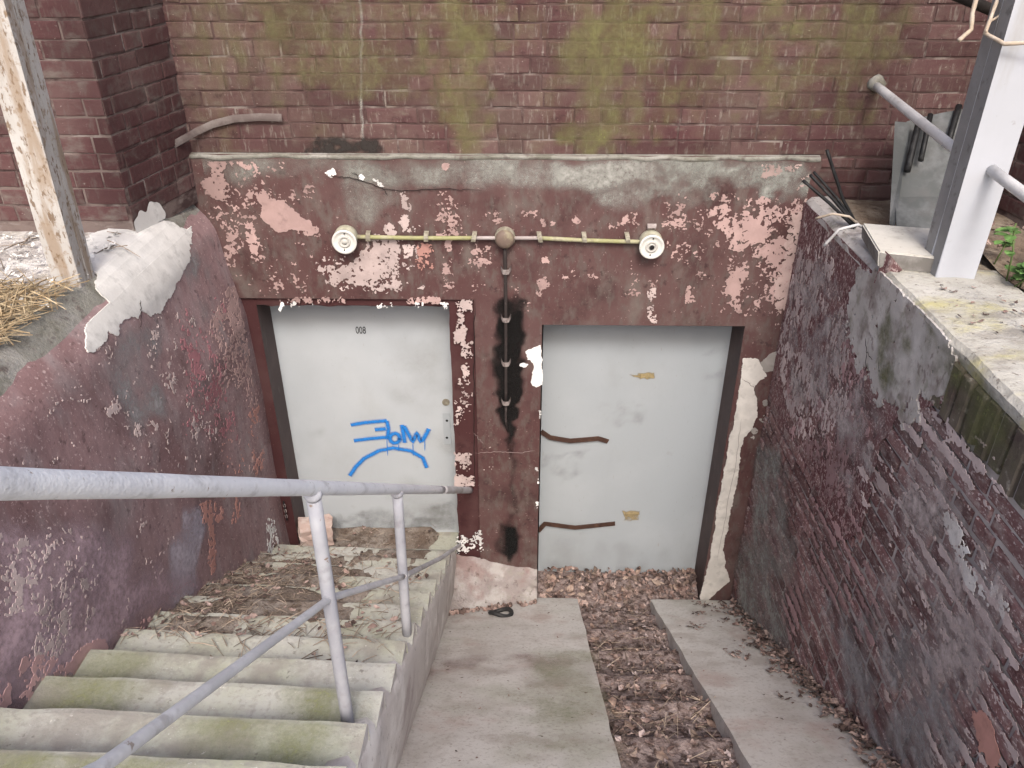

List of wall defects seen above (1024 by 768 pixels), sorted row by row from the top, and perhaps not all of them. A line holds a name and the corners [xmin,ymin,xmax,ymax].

crack [326,173,482,195]
spalling [84,161,492,475]
leakage [494,299,526,444]
peeling [625,261,661,323]
flaking render [661,164,1022,768]
leakage [501,526,517,561]